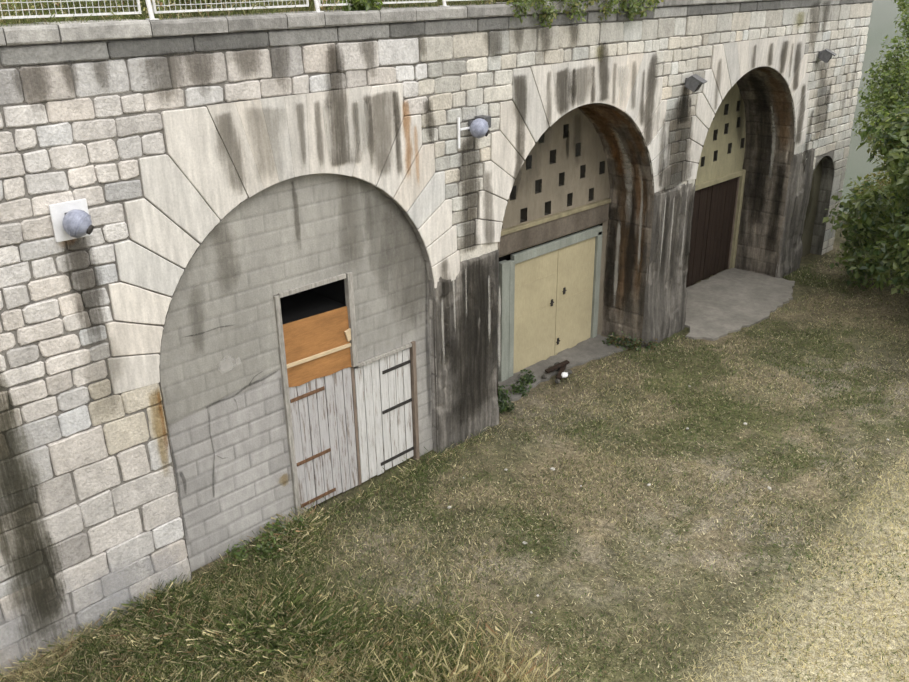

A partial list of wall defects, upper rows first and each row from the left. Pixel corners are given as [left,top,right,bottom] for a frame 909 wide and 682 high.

damp [330,47,346,164]
damp [514,77,525,192]
damp [557,70,575,110]
damp [592,46,608,101]
damp [641,57,656,141]
damp [748,79,772,212]
damp [769,42,813,161]
damp [771,167,784,240]
damp [458,265,491,411]